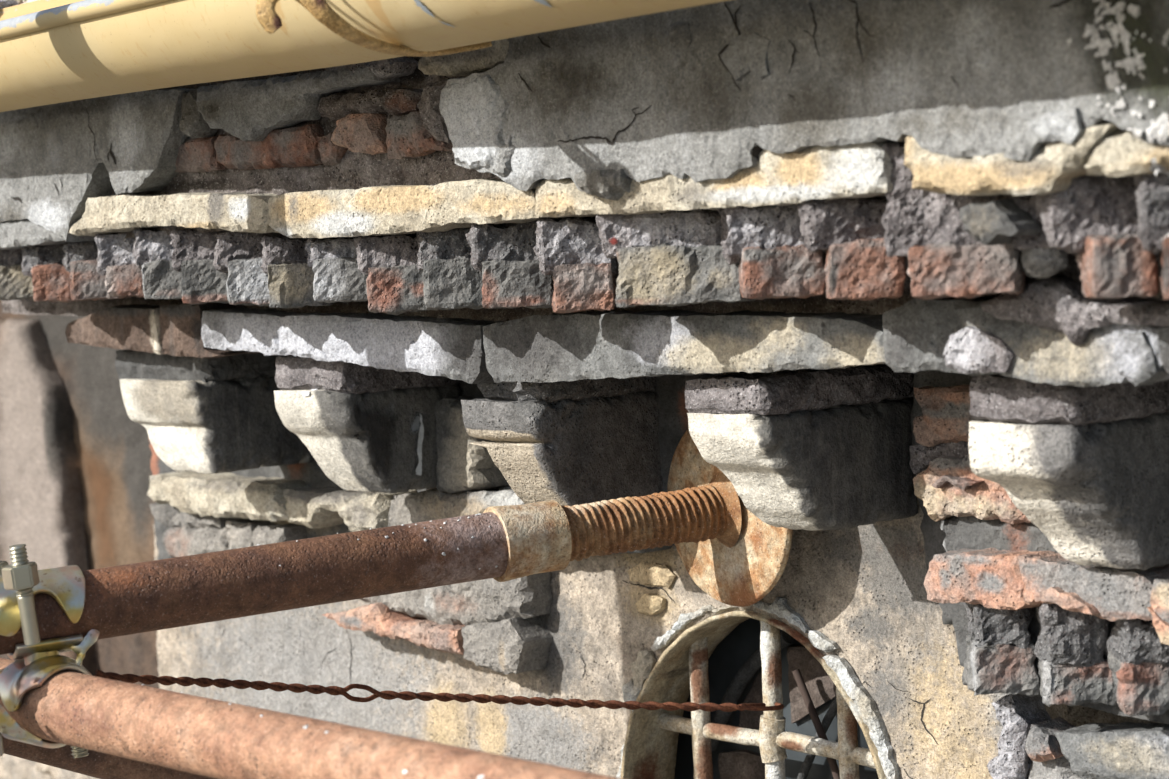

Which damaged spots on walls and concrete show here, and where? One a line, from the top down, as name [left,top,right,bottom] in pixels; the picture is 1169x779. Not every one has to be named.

crack [718,2,820,100]
crack [849,0,872,63]
damp [1081,0,1169,112]
spalling [175,38,509,173]
crack [558,105,652,146]
flaking render [1003,107,1087,161]
flaking render [909,326,1058,553]
spalling [1033,587,1099,614]
spalling [1147,607,1169,645]